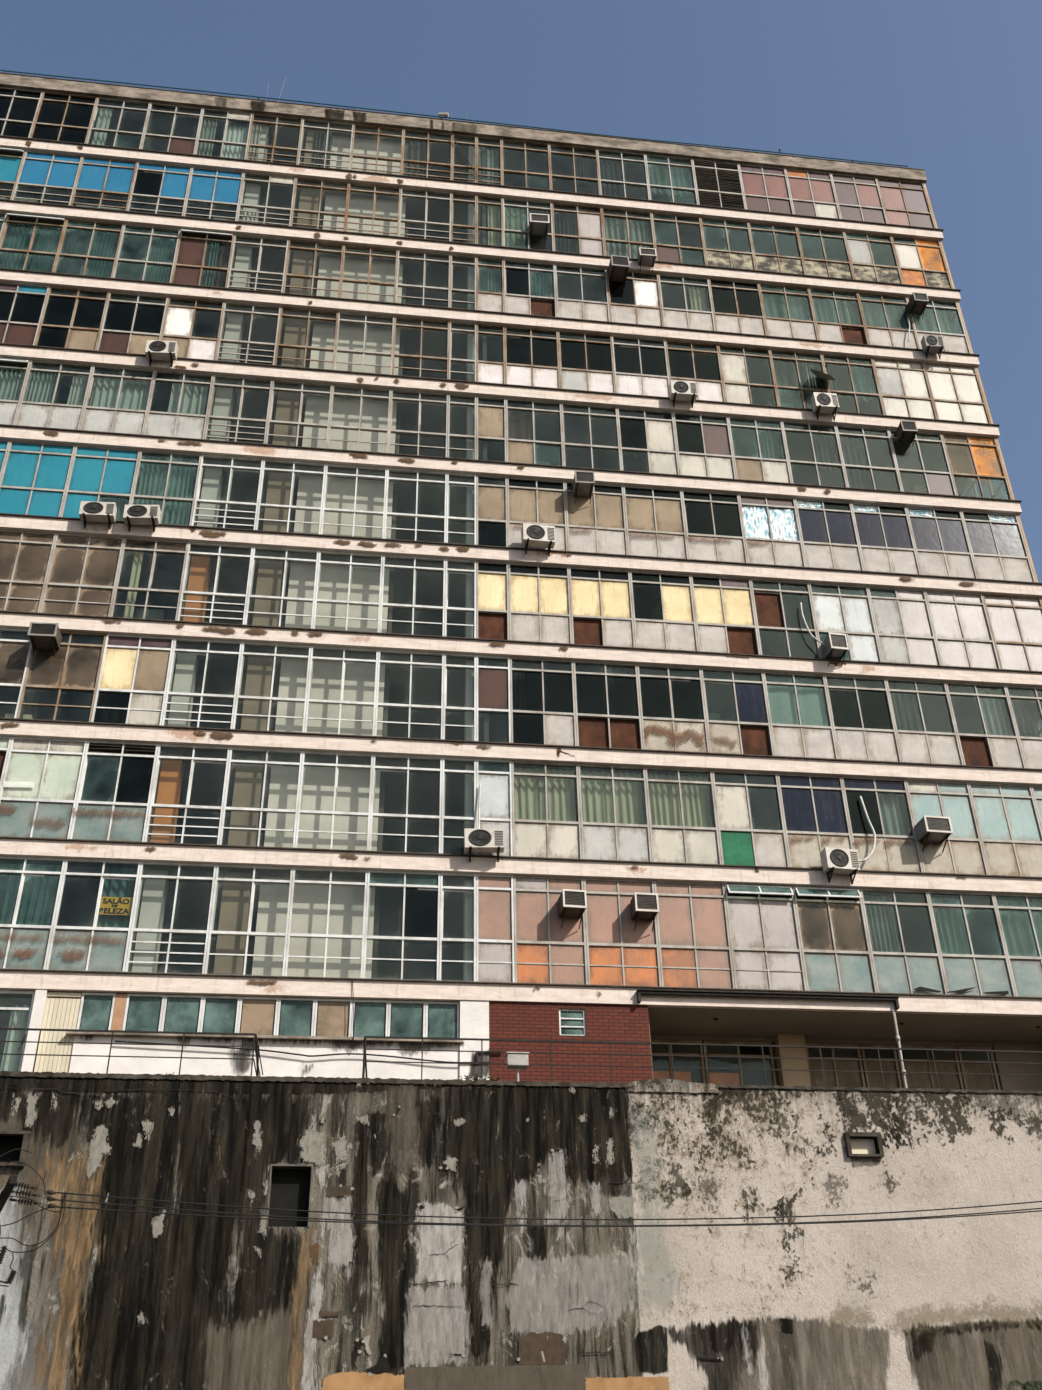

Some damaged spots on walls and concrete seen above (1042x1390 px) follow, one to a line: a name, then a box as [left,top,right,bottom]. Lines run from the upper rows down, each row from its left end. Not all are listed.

corrosion [644,724,736,749]
corrosion [0,934,125,961]
peeling [10,1092,57,1128]
peeling [297,1114,354,1197]
peeling [439,1155,459,1171]
leakage [0,1037,1042,1390]
spalling [312,1311,341,1340]
spalling [352,1335,390,1376]
spalling [517,1332,566,1365]